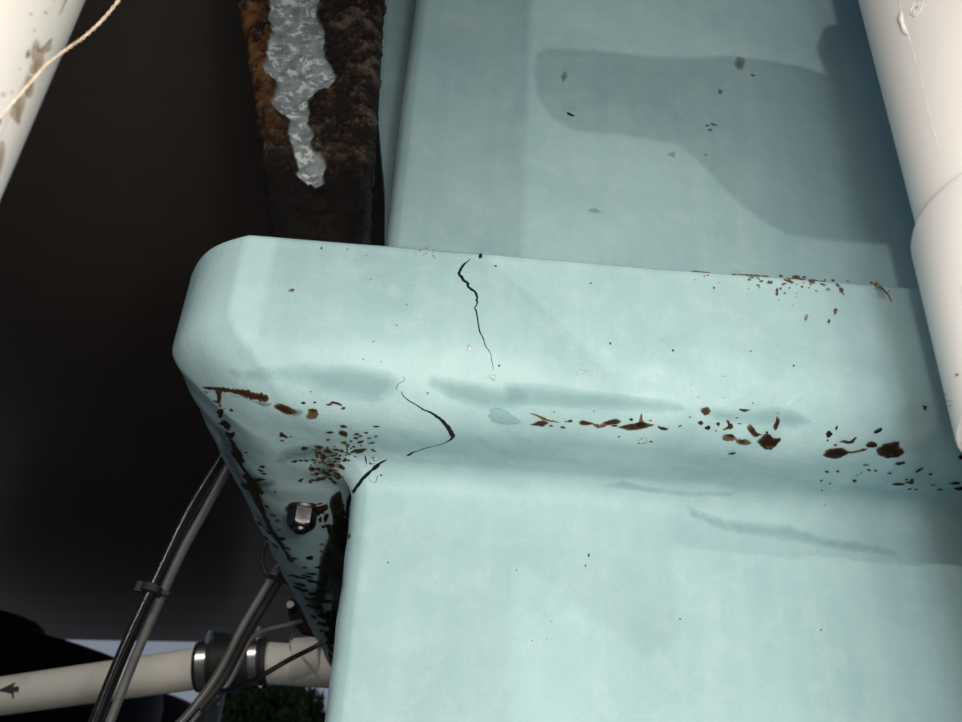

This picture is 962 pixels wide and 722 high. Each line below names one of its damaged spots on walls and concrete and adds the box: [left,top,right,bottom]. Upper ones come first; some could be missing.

crack [457,259,494,369]
rust [731,274,849,300]
rust [203,386,346,569]
rust [291,425,379,485]
crack [345,377,455,522]
rust [530,403,781,455]
rust [820,426,962,491]